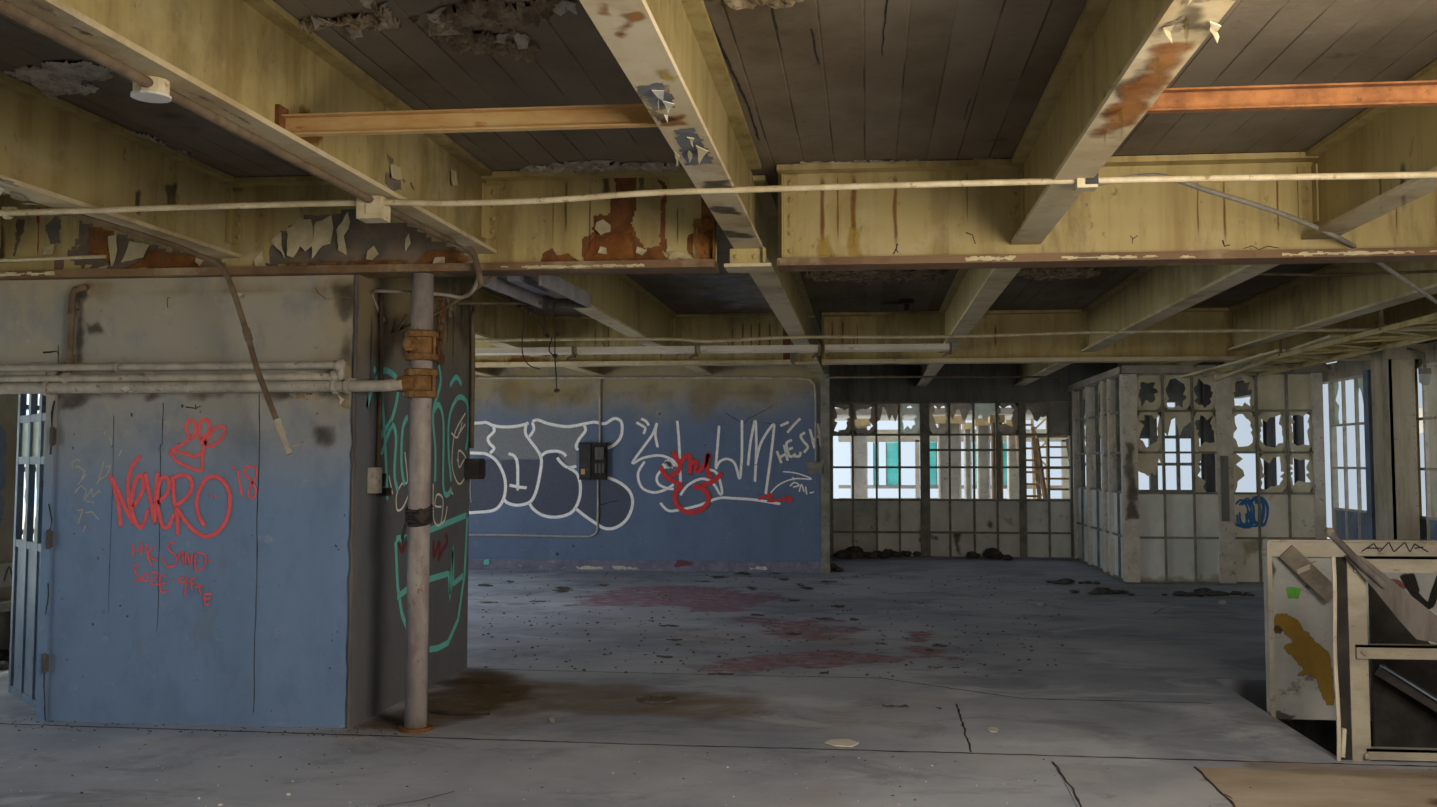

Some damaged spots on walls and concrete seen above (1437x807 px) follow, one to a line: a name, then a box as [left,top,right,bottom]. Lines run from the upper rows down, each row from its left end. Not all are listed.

spalling [299,0,578,42]
corrosion [1095,9,1202,135]
peeling [501,83,714,269]
peeling [0,216,226,276]
peeling [254,209,472,317]
leakage [364,712,405,729]
leakage [427,669,754,726]
crack [1052,762,1082,807]